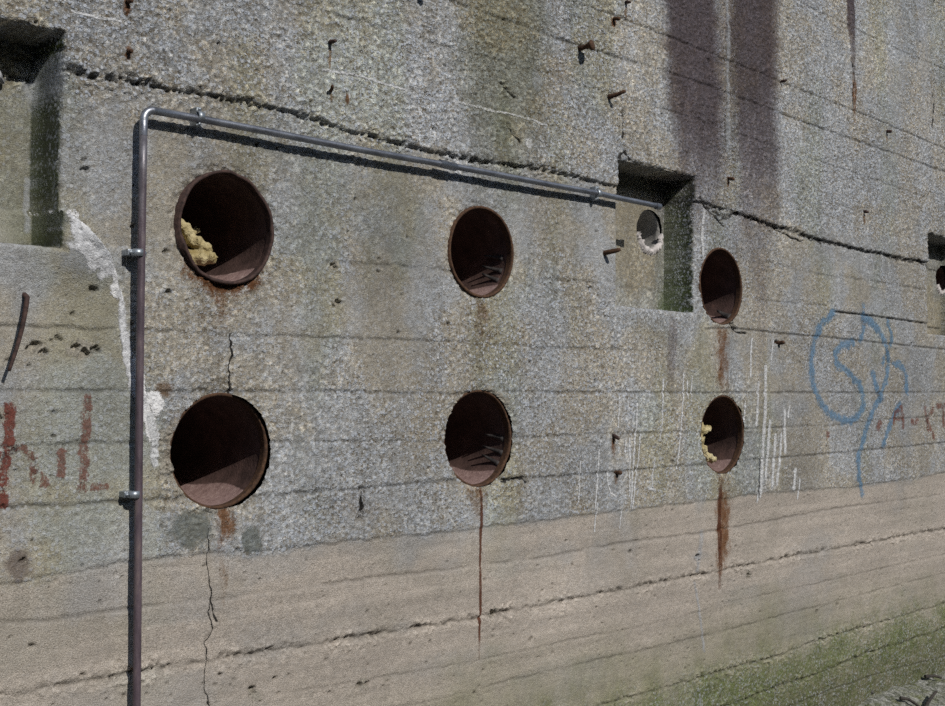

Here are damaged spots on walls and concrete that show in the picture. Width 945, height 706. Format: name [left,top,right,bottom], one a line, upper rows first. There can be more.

crack [699,195,924,266]
crack [204,528,218,706]